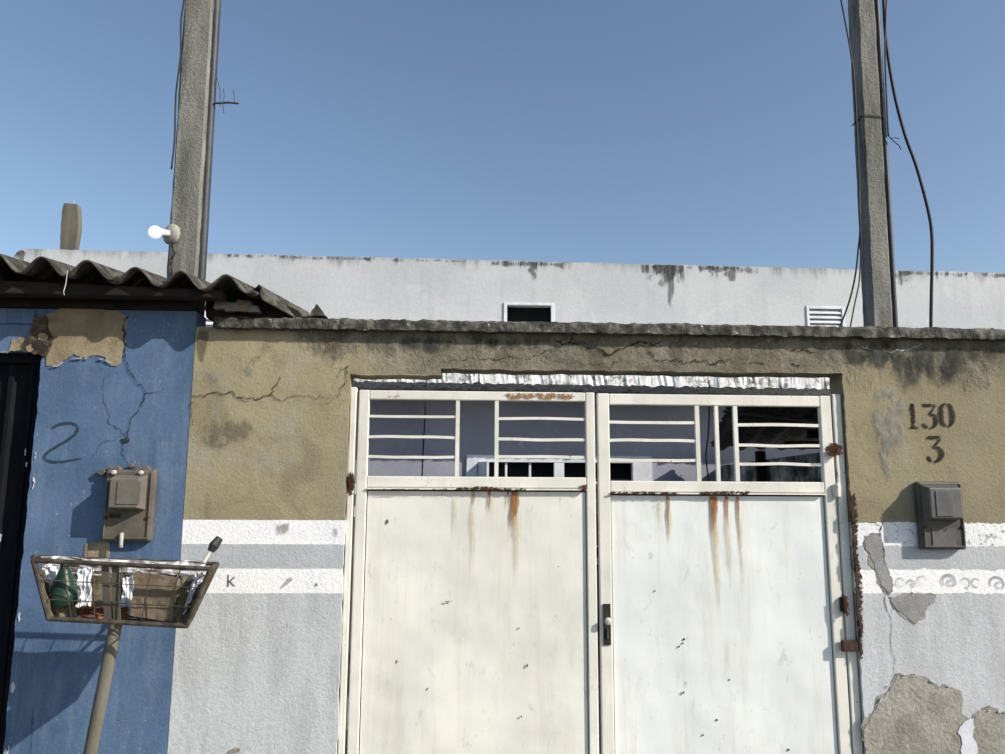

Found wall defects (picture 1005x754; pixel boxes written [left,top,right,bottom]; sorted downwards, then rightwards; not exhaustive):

water stain [642,264,684,302]
flaking render [0,308,128,367]
crack [88,315,157,470]
crack [190,366,349,426]
crack [441,337,763,368]
water stain [845,343,992,384]
corrosion [825,443,843,457]
corrosion [700,491,750,537]
corrosion [836,471,864,659]
flaking render [863,533,936,624]
flaking render [860,673,1005,754]